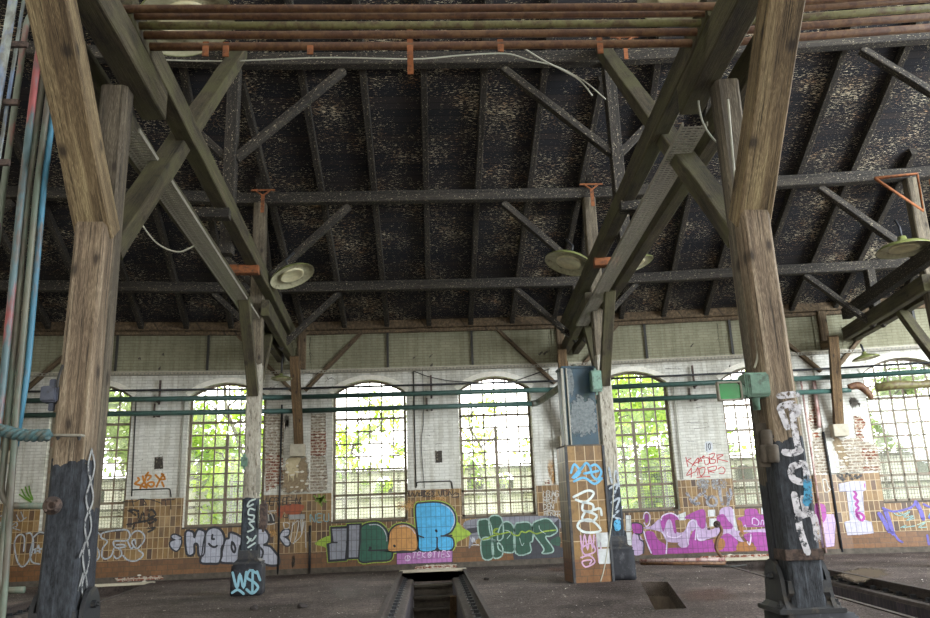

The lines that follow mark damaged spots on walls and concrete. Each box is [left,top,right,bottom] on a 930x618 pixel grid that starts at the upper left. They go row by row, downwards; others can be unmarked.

peeling [264,413,329,493]
peeling [806,388,881,475]